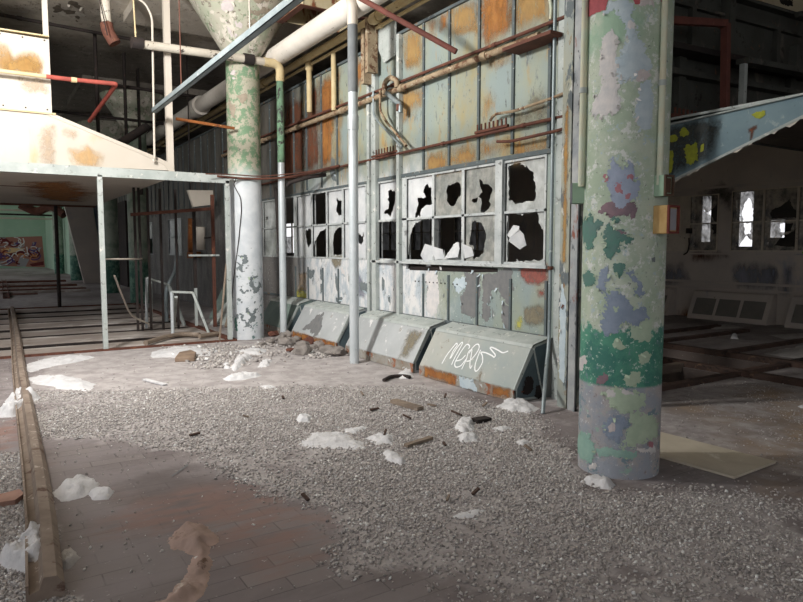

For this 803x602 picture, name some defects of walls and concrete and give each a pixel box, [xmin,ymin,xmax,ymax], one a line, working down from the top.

peeling [221,0,274,38]
corrosion [431,0,546,43]
corrosion [404,34,421,64]
peeling [591,0,655,133]
corrosion [403,90,421,120]
corrosion [428,145,489,169]
peeling [232,255,262,331]
peeling [425,266,442,316]
peeling [453,267,515,329]
peeling [580,157,659,455]
corrosion [424,366,456,385]
corrosion [493,387,510,398]